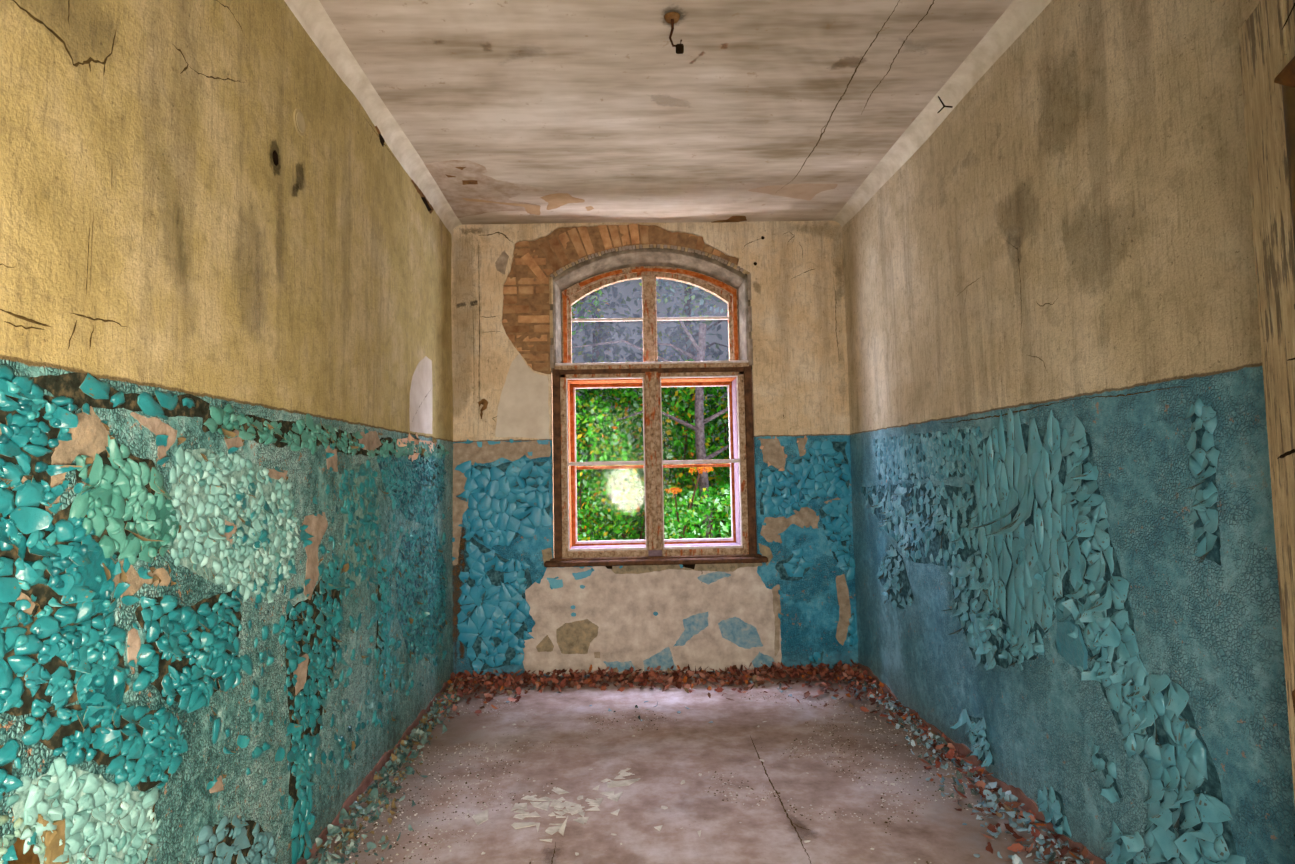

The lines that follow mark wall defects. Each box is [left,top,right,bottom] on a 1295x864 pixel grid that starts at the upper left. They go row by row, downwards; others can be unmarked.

crack [12,0,118,76]
crack [778,0,934,191]
flaking render [411,160,739,375]
crack [751,738,813,863]